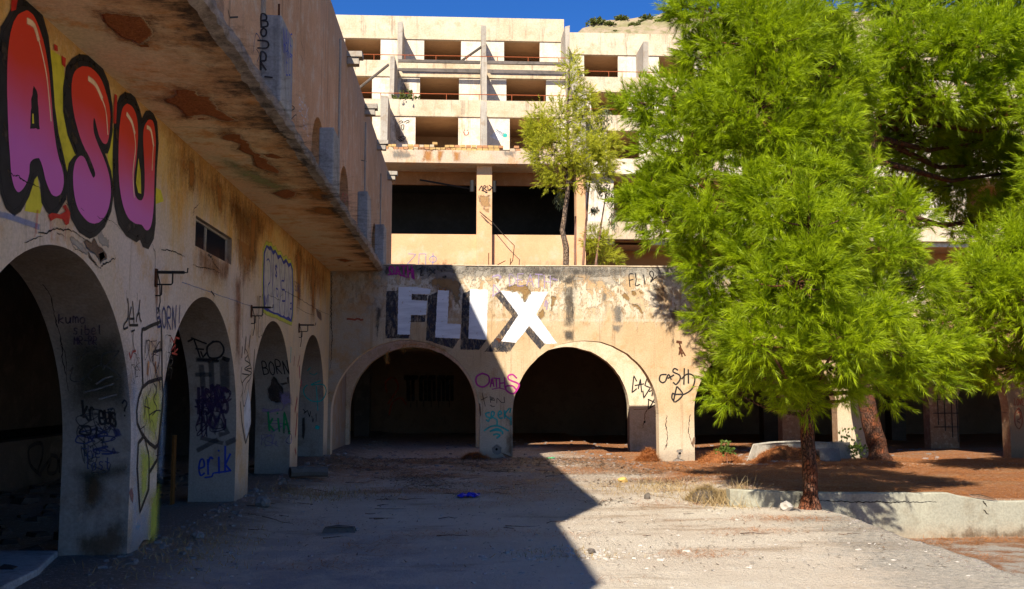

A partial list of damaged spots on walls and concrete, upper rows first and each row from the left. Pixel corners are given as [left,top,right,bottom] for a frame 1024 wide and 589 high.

spalling [93,10,154,47]
spalling [161,87,296,199]
leakage [181,148,265,276]
crack [25,200,117,267]
spalling [83,238,107,264]
flaking render [495,278,531,302]
flaking render [538,295,557,320]
flaking render [622,290,644,314]
crack [820,497,937,505]